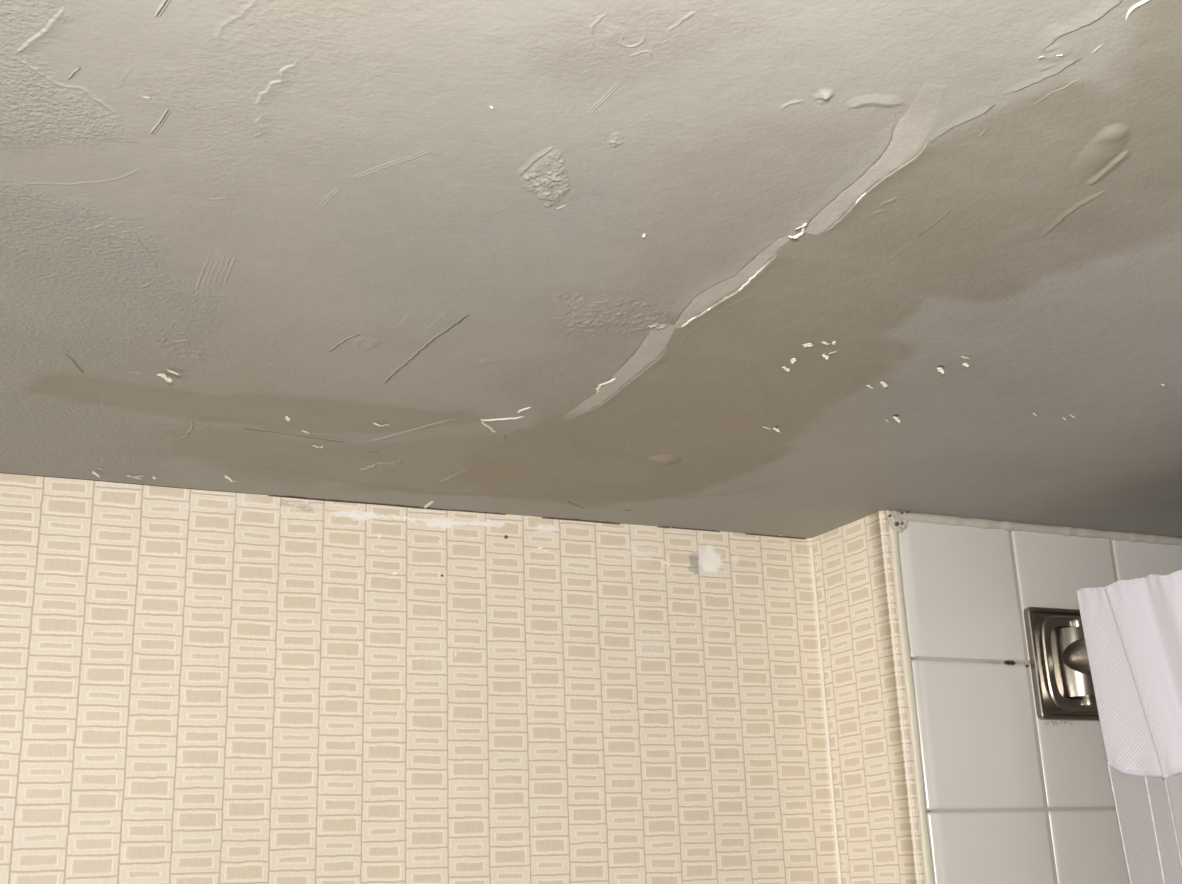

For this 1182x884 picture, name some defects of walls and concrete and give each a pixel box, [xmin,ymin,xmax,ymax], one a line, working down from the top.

spalling [154,0,172,19]
spalling [517,145,573,209]
leakage [18,0,1182,510]
peeling [551,80,950,425]
crack [383,315,469,385]